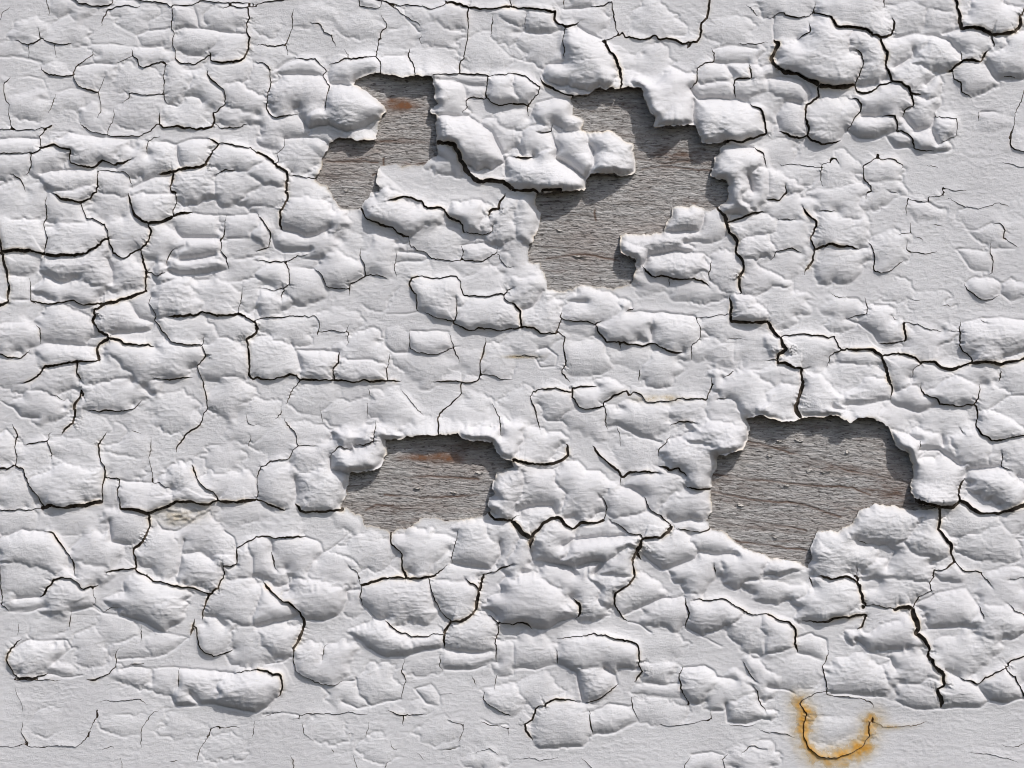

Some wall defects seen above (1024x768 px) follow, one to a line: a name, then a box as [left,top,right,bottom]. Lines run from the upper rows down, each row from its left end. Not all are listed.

peeling [305,26,766,292]
crack [591,0,715,89]
crack [725,0,958,186]
crack [949,0,1024,121]
crack [0,0,579,657]
crack [316,140,1024,446]
peeling [330,423,524,532]
peeling [659,415,1024,567]
crack [196,581,369,762]
crack [352,497,710,761]
crack [685,478,1024,708]
rust [792,696,929,767]